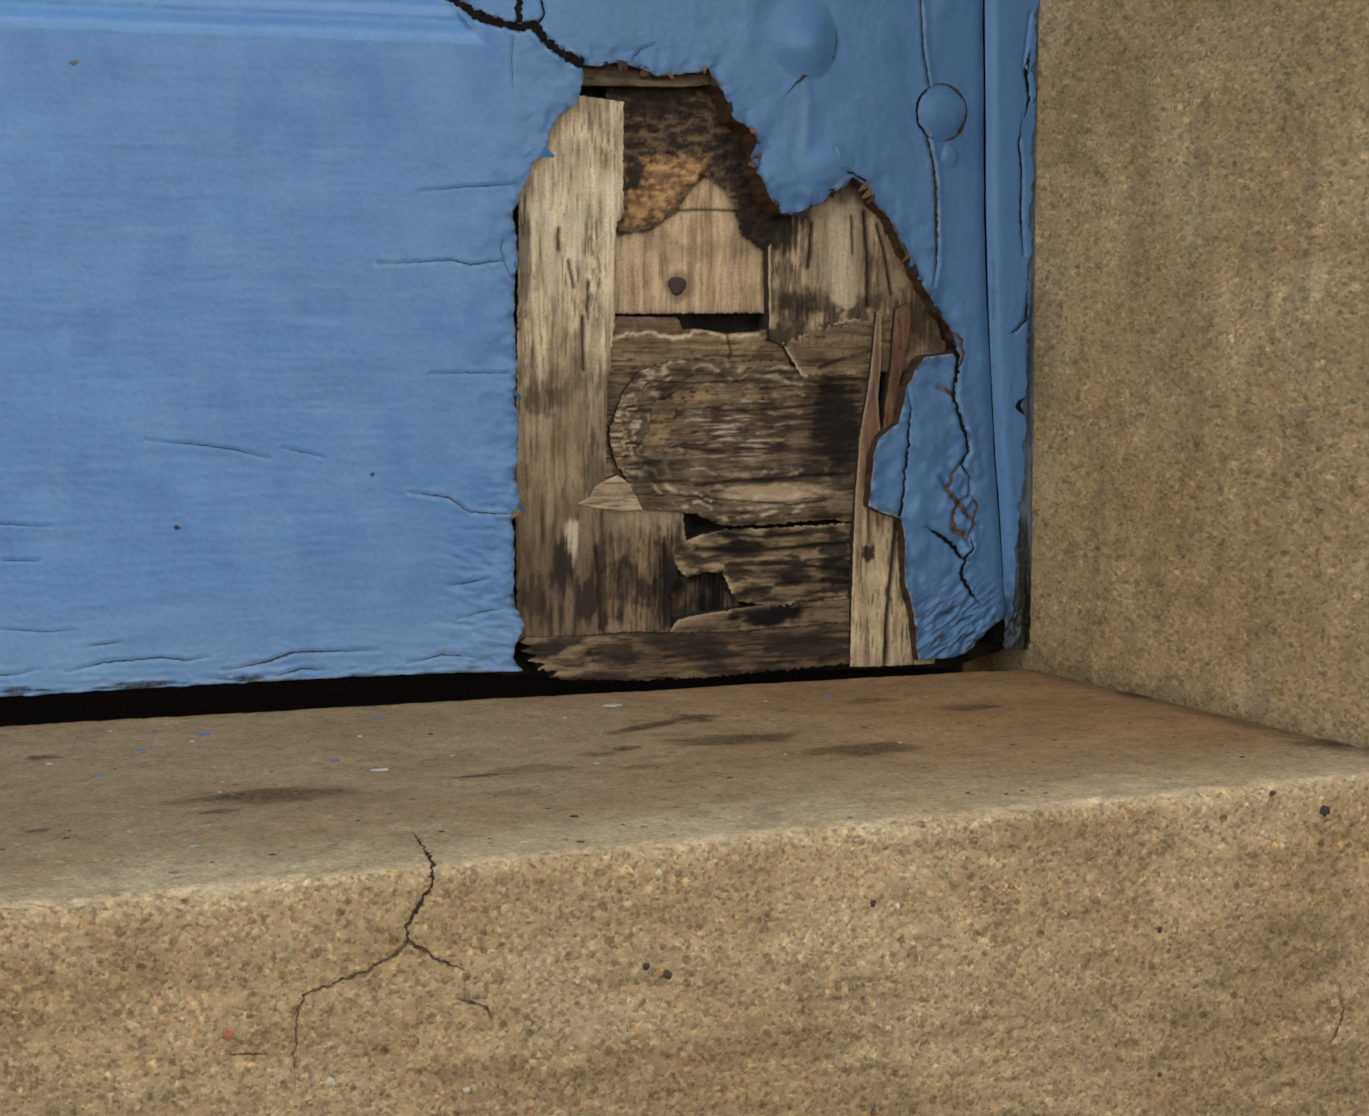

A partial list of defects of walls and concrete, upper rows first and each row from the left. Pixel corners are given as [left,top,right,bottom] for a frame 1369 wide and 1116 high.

crack [446,0,585,85]
peeling [604,59,674,79]
peeling [748,127,763,169]
peeling [773,199,809,222]
crack [925,135,939,281]
crack [898,318,981,606]
crack [226,830,493,1094]
crack [1331,996,1345,1041]